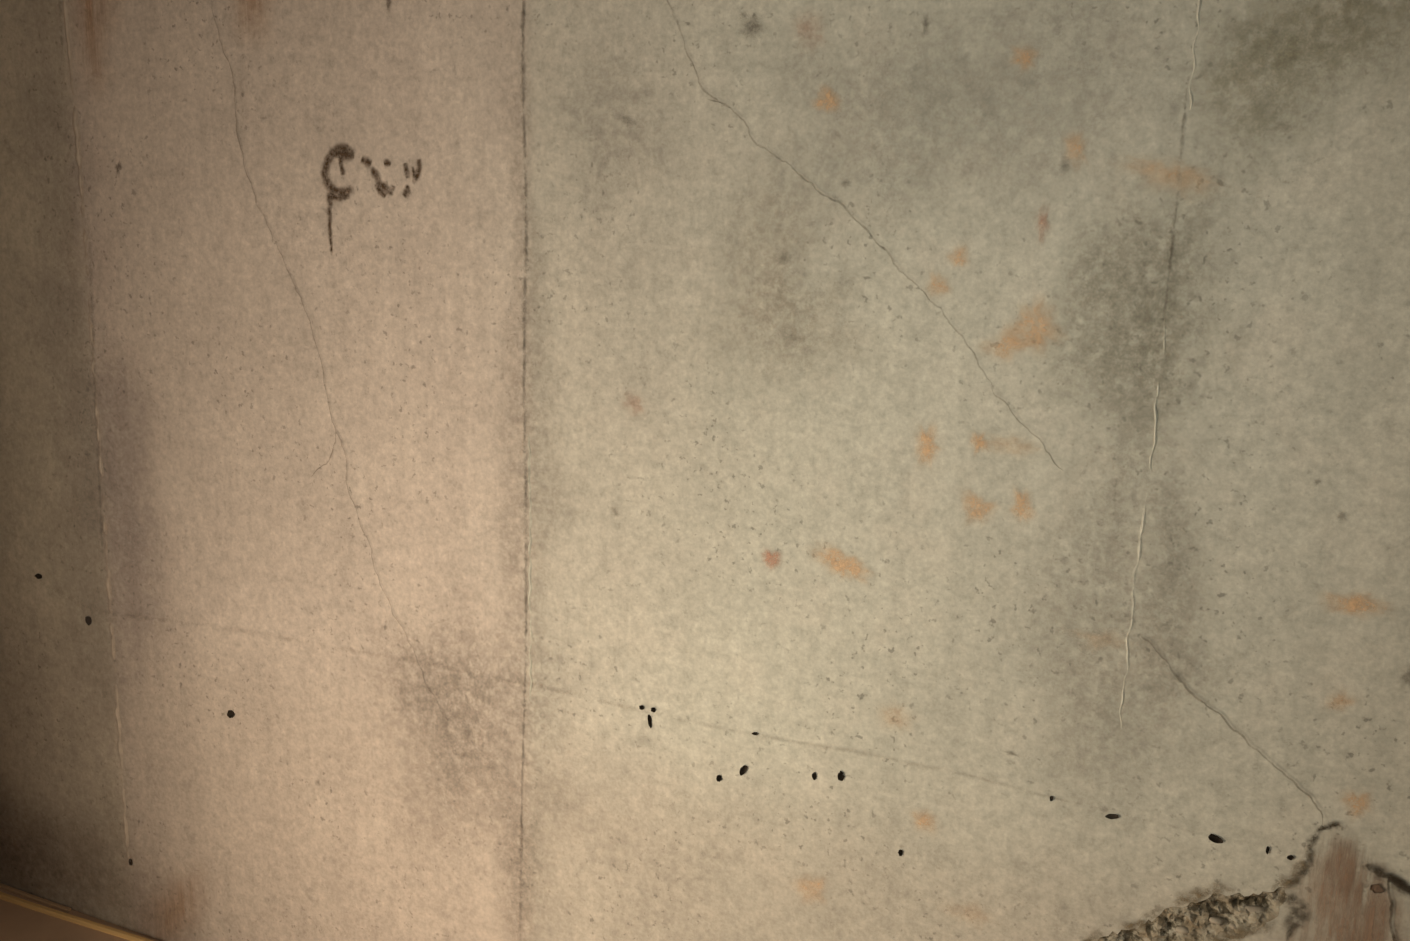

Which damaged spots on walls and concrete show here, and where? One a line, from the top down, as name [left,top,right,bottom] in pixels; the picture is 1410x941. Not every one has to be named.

spalling [1083,823,1339,941]